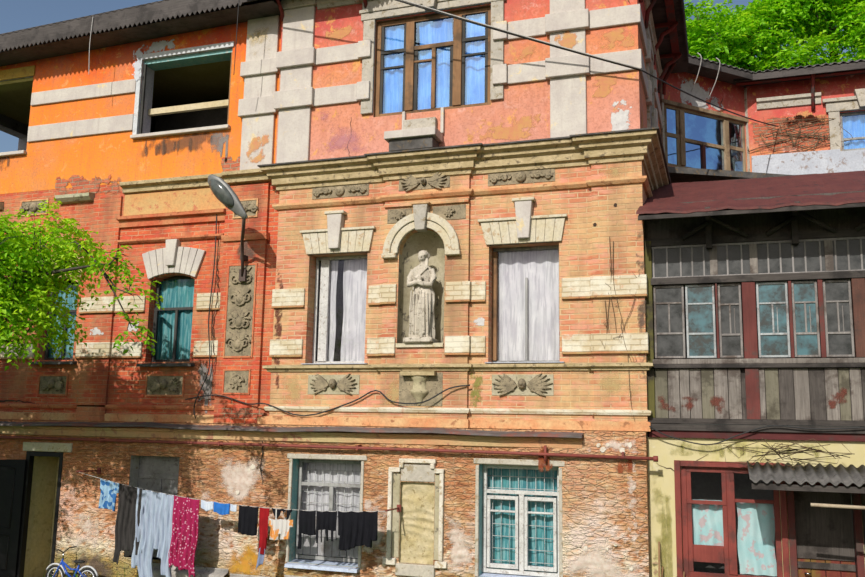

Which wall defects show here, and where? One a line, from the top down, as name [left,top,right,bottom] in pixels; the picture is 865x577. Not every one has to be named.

peeling [592,74,632,131]
peeling [680,79,724,111]
spalling [751,110,830,153]
spalling [55,174,120,195]
damp [657,513,673,577]